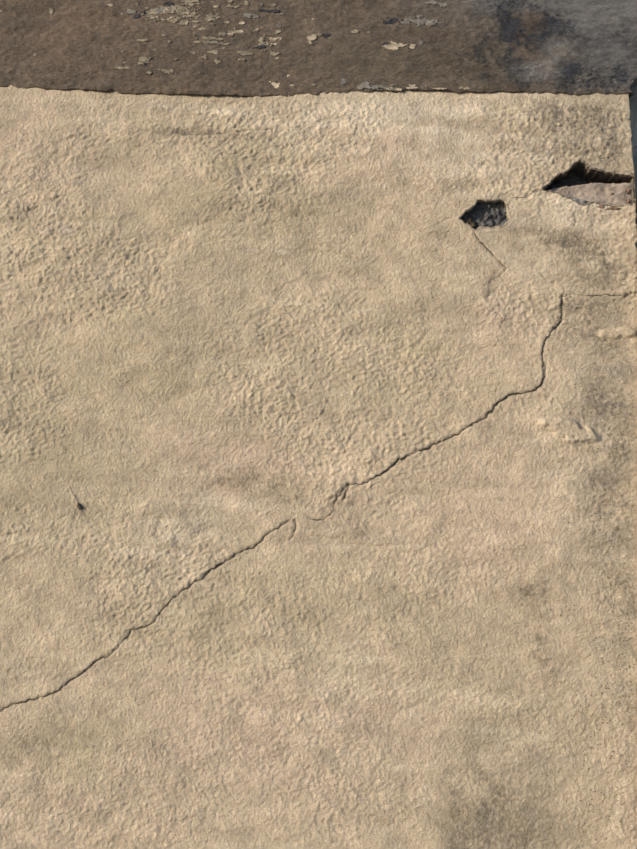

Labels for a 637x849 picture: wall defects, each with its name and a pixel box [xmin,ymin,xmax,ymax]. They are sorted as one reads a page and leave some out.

peeling [115,48,178,74]
peeling [121,0,285,64]
peeling [306,33,331,44]
peeling [337,78,418,92]
peeling [382,41,423,50]
damp [473,0,629,90]
spalling [543,160,634,210]
spalling [458,198,534,231]
crack [474,231,506,326]
crack [0,293,620,712]
damp [574,577,637,779]